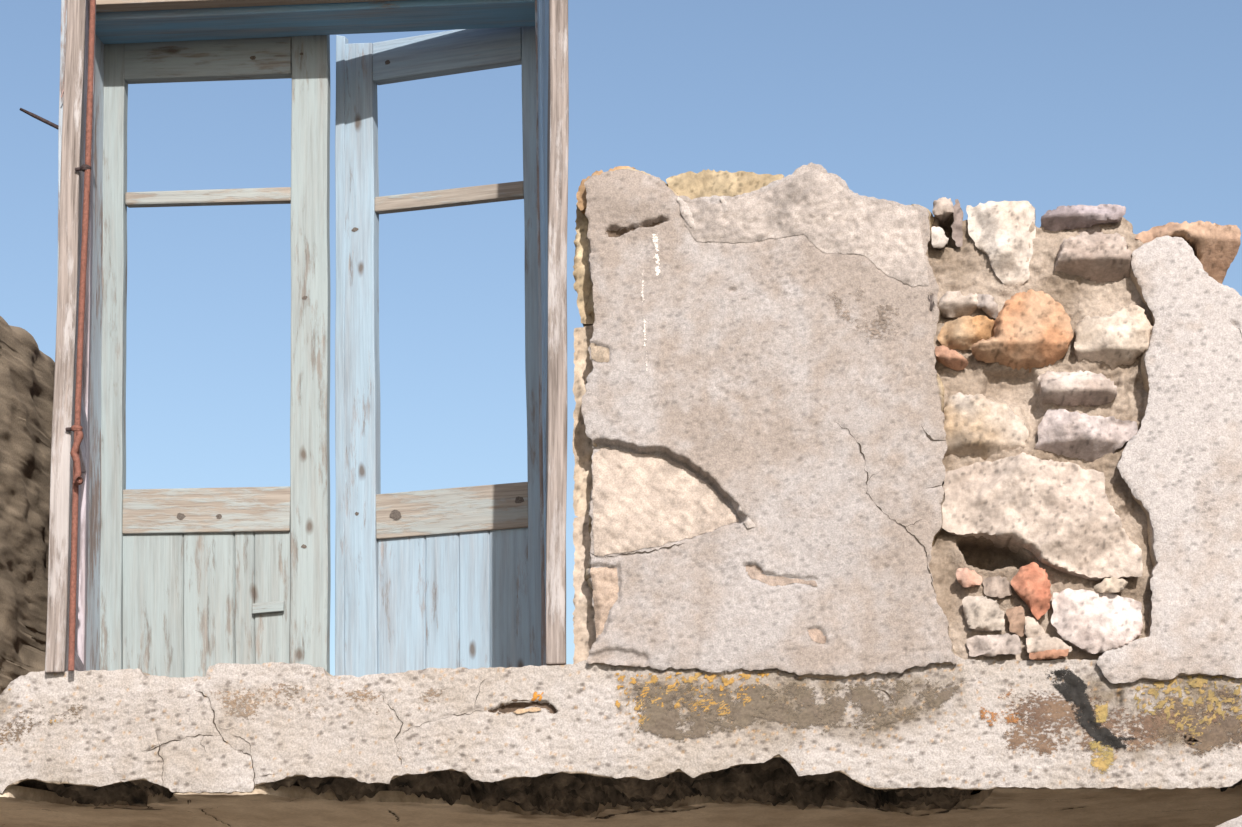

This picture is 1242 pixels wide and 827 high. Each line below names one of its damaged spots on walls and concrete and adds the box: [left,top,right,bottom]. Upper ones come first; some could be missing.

spalling [605,222,663,237]
spalling [590,447,755,638]
spalling [746,565,817,587]
crack [148,691,299,802]
hole [488,699,558,714]
water stain [1046,669,1242,774]